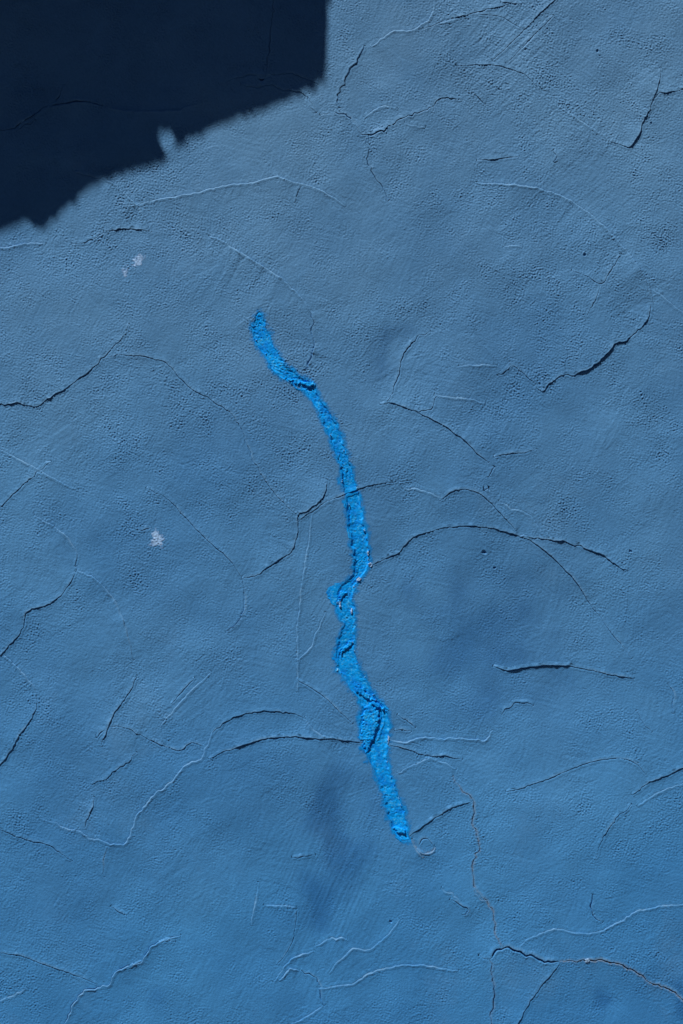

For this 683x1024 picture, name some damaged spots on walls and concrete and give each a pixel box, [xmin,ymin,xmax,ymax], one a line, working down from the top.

crack [320,0,486,201]
crack [248,310,683,1024]